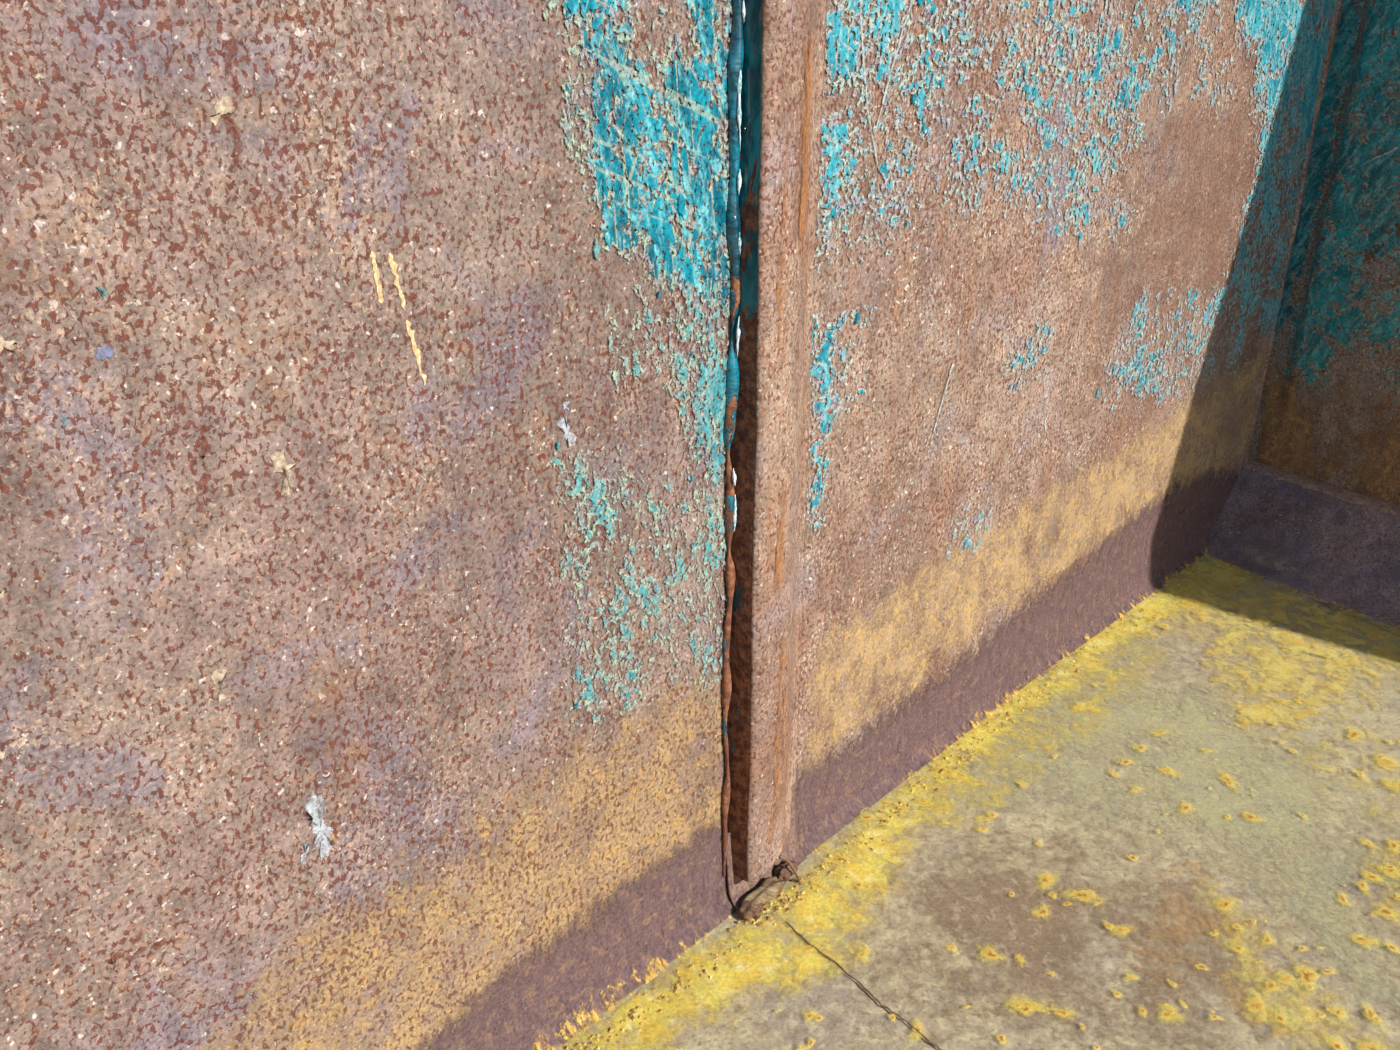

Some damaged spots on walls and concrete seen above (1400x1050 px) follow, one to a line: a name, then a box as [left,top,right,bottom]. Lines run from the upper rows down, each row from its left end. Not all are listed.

peeling [543,0,733,727]
corrosion [782,34,813,239]
peeling [806,302,877,536]
peeling [945,482,997,561]
corrosion [808,352,1264,762]
peeling [814,0,1400,415]
corrosion [249,681,724,1050]
crack [785,921,943,1050]
corrosion [535,547,1400,1050]